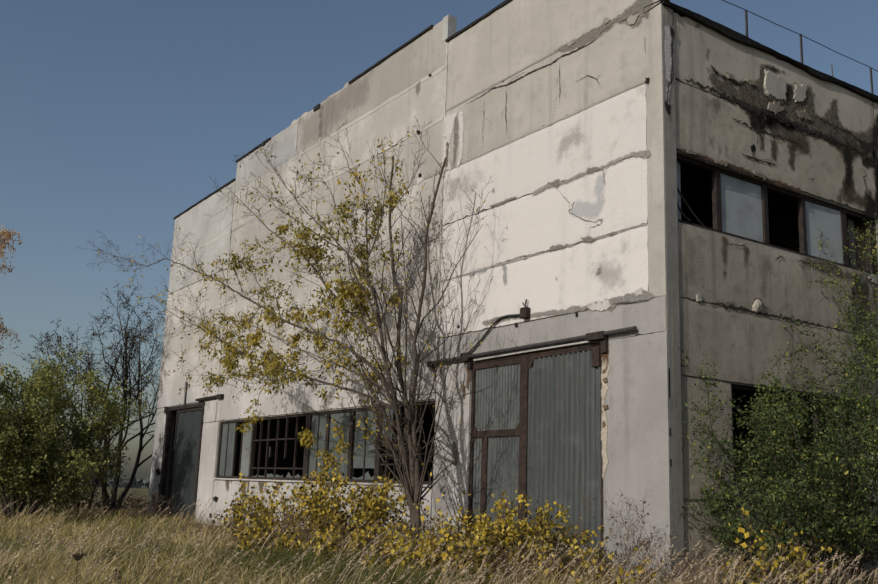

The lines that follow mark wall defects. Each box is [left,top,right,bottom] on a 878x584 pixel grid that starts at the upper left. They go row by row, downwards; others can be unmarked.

crack [470,13,635,137]
spalling [554,0,653,52]
peeling [664,12,675,85]
peeling [442,111,464,170]
water stain [757,115,809,170]
water stain [838,115,878,217]
peeling [548,167,605,243]
peeling [482,288,653,327]
spalling [601,357,610,478]